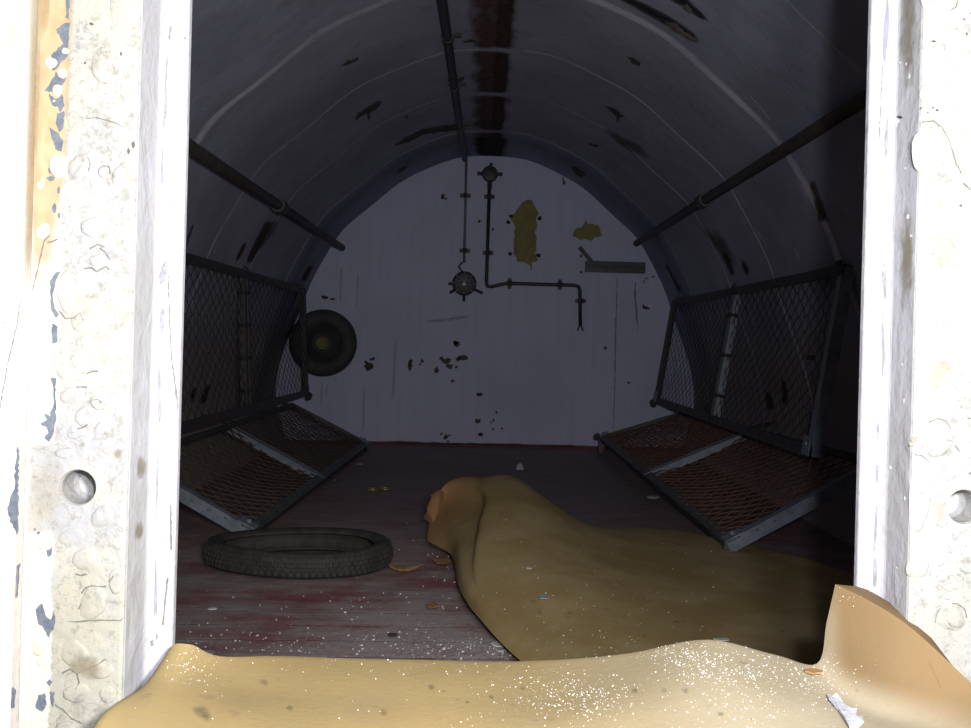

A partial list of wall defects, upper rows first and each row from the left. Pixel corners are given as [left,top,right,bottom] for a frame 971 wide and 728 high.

spalling [623,0,697,42]
spalling [672,0,705,19]
peeling [45,0,70,151]
crack [922,120,971,190]
crack [0,235,58,408]
peeling [50,271,61,344]
peeling [434,340,468,382]
peeling [40,378,57,442]
peeling [7,447,20,534]
peeling [36,604,55,637]
peeling [35,679,55,711]